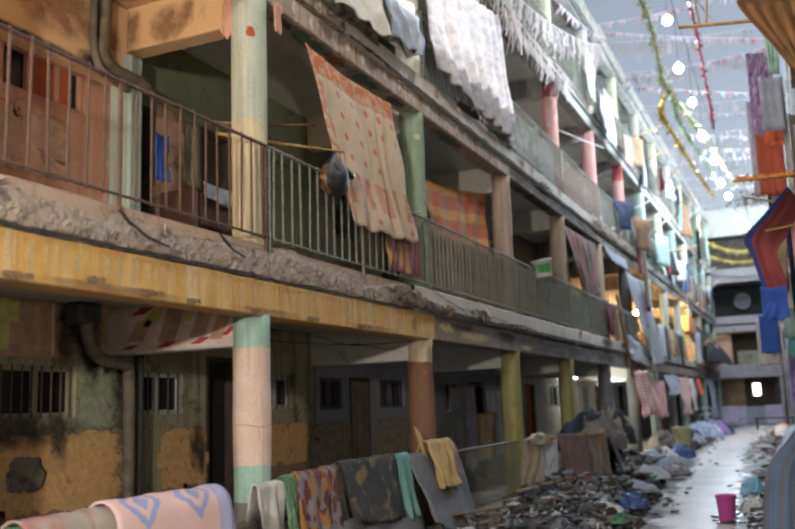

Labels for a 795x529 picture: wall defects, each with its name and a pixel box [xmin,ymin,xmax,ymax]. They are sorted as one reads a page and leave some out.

leakage [128,15,138,44]
leakage [153,1,192,39]
peeling [0,98,66,177]
peeling [153,110,186,216]
spalling [0,175,459,316]
leakage [59,309,97,373]
leakage [114,369,123,409]
peeling [0,361,123,527]
peeling [157,427,209,491]
peeling [271,421,350,481]